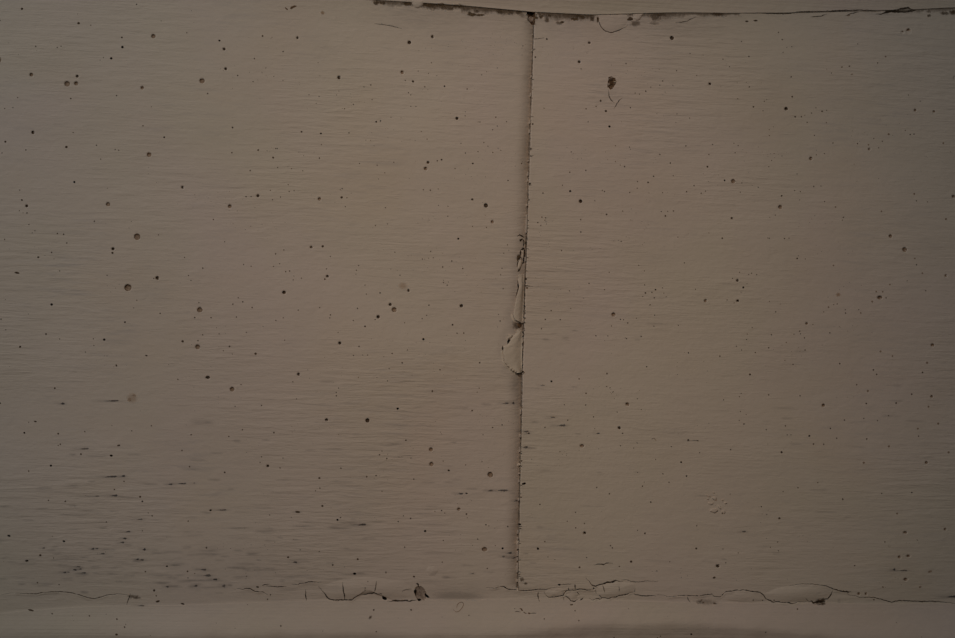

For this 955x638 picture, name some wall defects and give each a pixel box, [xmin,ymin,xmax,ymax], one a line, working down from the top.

crack [749,7,916,17]
peeling [510,234,526,328]
crack [486,27,955,606]
crack [236,581,415,603]